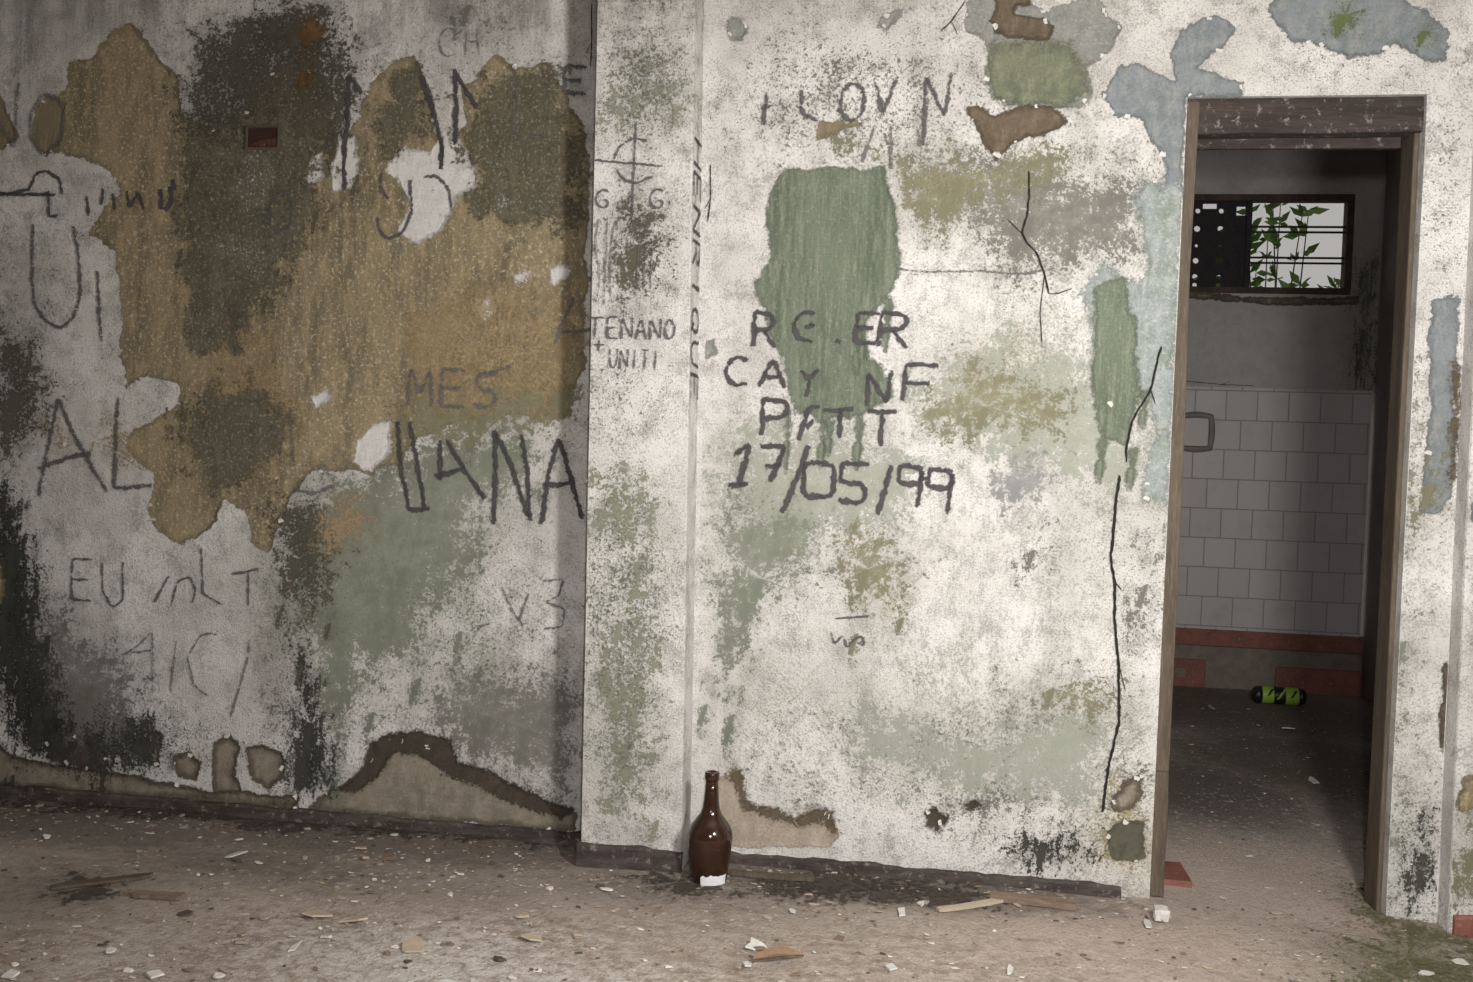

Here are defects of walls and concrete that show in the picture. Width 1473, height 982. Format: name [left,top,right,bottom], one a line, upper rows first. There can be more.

damp [0,308,567,854]
spalling [0,713,578,832]
peeling [0,23,593,553]
crack [1008,171,1072,342]
peeling [964,0,1359,508]
crack [1102,346,1252,812]
peeling [1268,0,1450,63]
peeling [1406,294,1473,529]